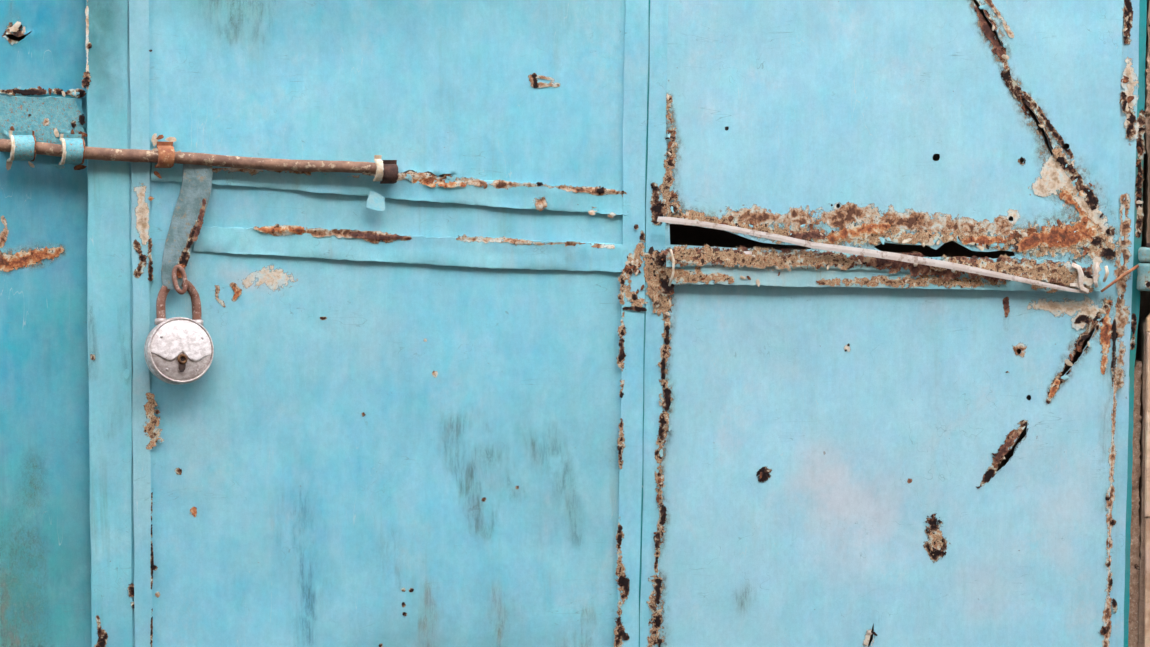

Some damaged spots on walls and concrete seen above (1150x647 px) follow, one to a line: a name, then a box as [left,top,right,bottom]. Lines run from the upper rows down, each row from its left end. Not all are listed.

corrosion [1135,109,1146,238]